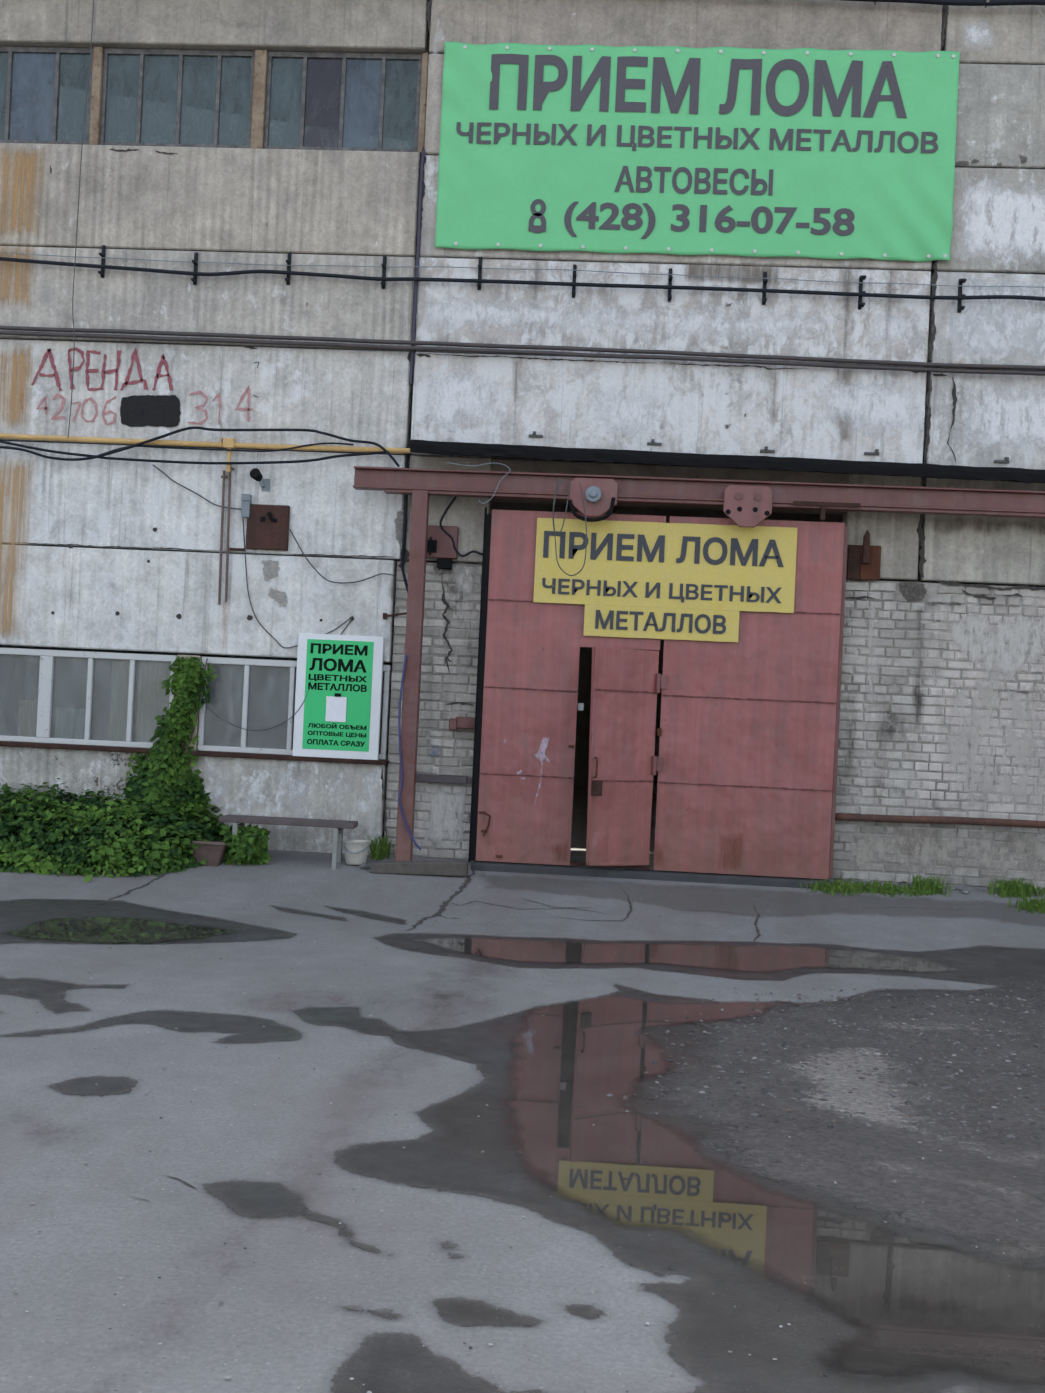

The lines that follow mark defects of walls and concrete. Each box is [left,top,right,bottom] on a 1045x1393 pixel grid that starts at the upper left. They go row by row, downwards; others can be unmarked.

corrosion [0,152,36,304]
corrosion [0,350,30,423]
water stain [951,282,1045,356]
corrosion [0,464,25,634]